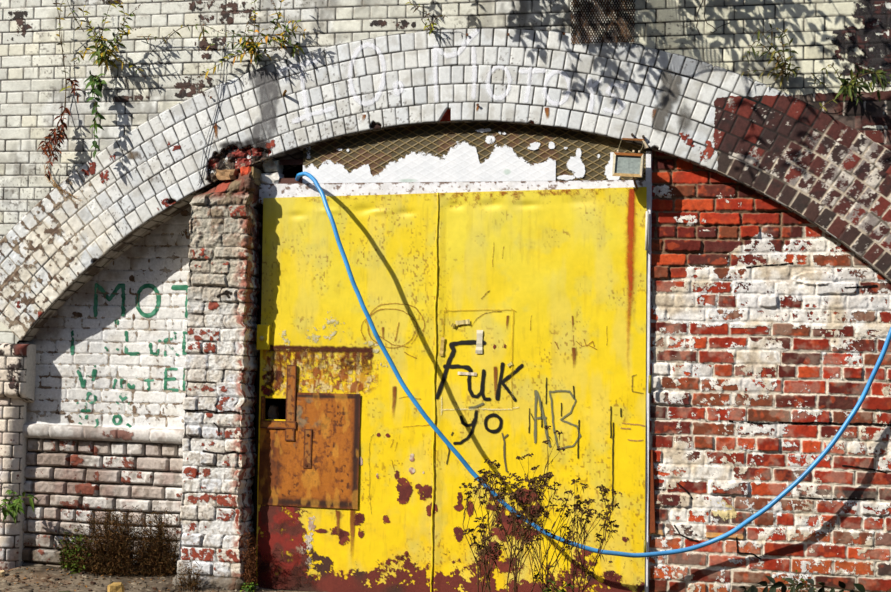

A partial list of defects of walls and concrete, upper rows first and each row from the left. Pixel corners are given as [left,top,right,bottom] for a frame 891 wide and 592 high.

spalling [205,140,275,183]
peeling [302,128,585,183]
peeling [597,152,620,180]
peeling [0,152,233,441]
peeling [239,367,284,397]
corrosion [260,345,377,468]
peeling [306,311,345,343]
corrosion [627,180,640,316]
flaking render [651,0,891,592]
peeling [24,441,153,563]
peeling [167,424,644,592]